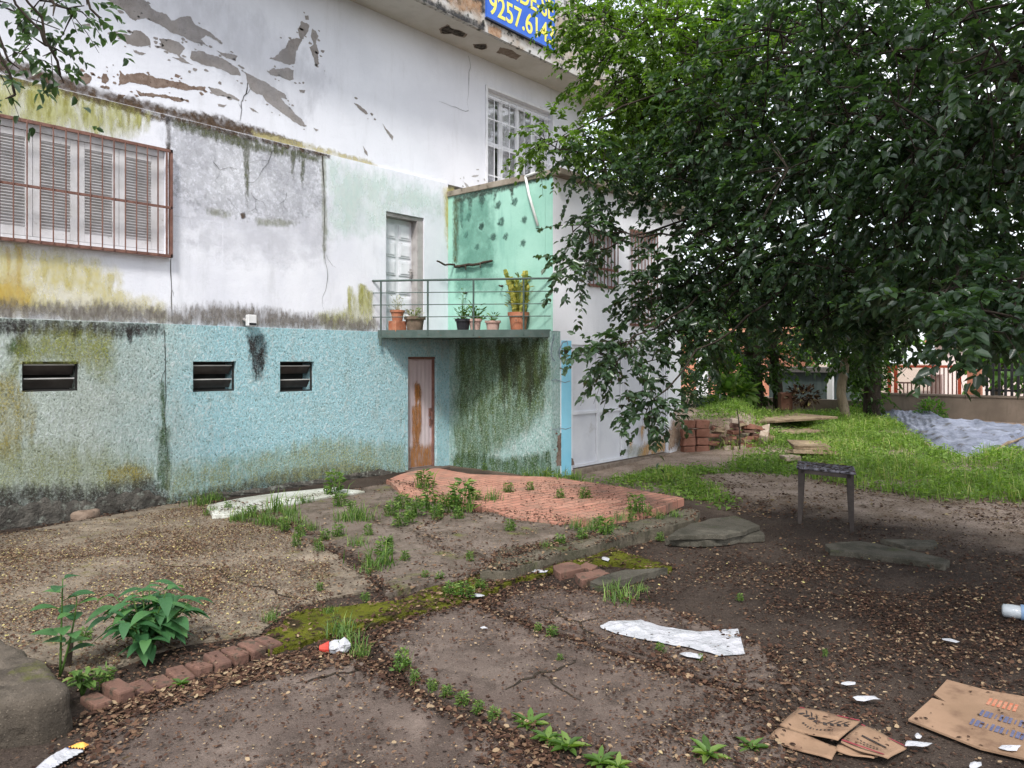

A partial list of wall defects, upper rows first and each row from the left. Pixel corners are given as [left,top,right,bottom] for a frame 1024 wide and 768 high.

peeling [68,0,325,131]
spalling [439,24,521,60]
damp [0,59,329,193]
crack [213,151,288,212]
damp [0,248,374,379]
damp [459,342,547,412]
corrosion [409,384,432,468]
damp [0,466,380,507]